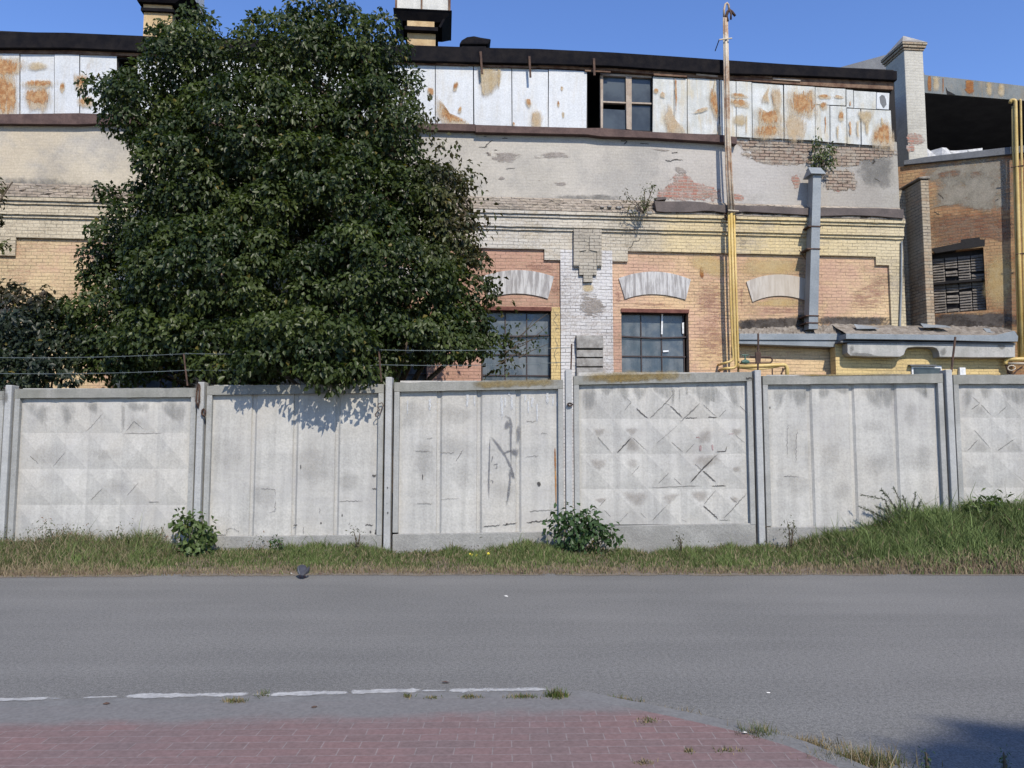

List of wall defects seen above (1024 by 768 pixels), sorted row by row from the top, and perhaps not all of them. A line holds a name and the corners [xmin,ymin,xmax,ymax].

corrosion [0,56,92,114]
corrosion [428,88,469,124]
corrosion [479,68,500,94]
corrosion [526,99,541,127]
corrosion [654,80,685,133]
corrosion [695,82,721,135]
corrosion [731,88,894,148]
spalling [657,167,744,202]
spalling [737,133,924,192]
water stain [862,158,890,185]